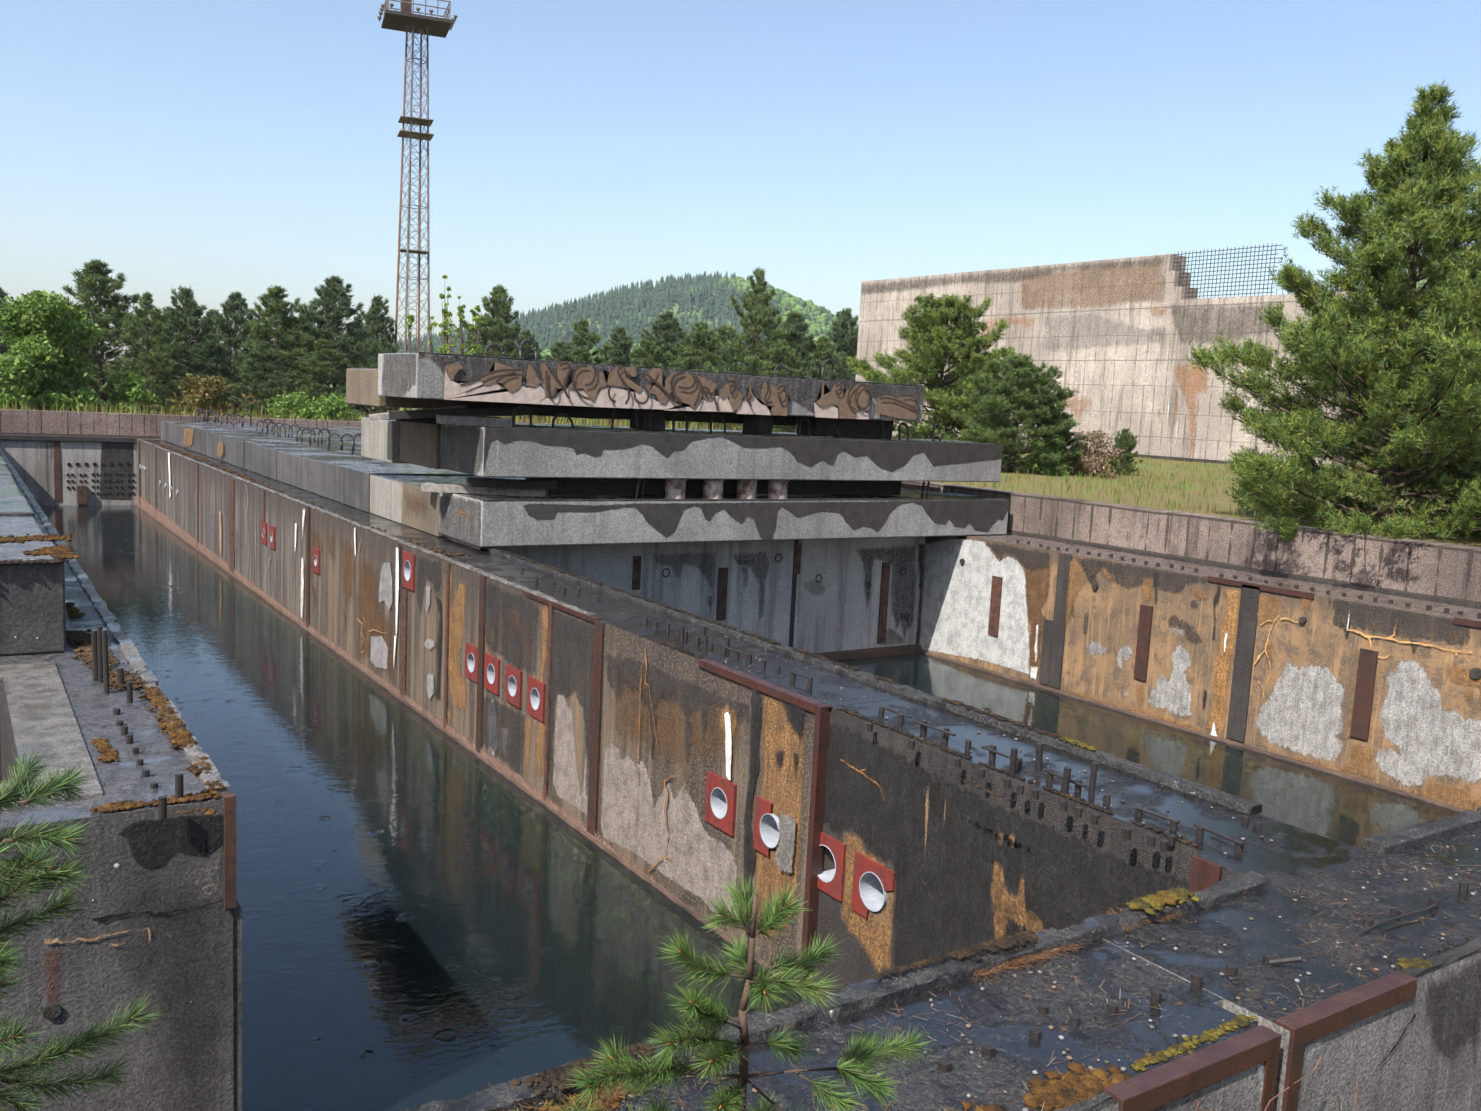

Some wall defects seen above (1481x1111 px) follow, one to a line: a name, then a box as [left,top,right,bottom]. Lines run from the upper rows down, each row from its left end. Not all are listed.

corrosion [443,570,467,723]
corrosion [1024,561,1050,680]
spalling [1087,641,1133,668]
corrosion [1063,588,1239,734]
spalling [1148,629,1192,716]
spalling [1255,662,1344,762]
crack [1347,624,1472,658]
spalling [1376,659,1481,786]
spalling [553,693,737,921]
corrosion [756,696,803,936]
corrosion [991,862,1043,939]
leakage [1428,963,1481,1060]